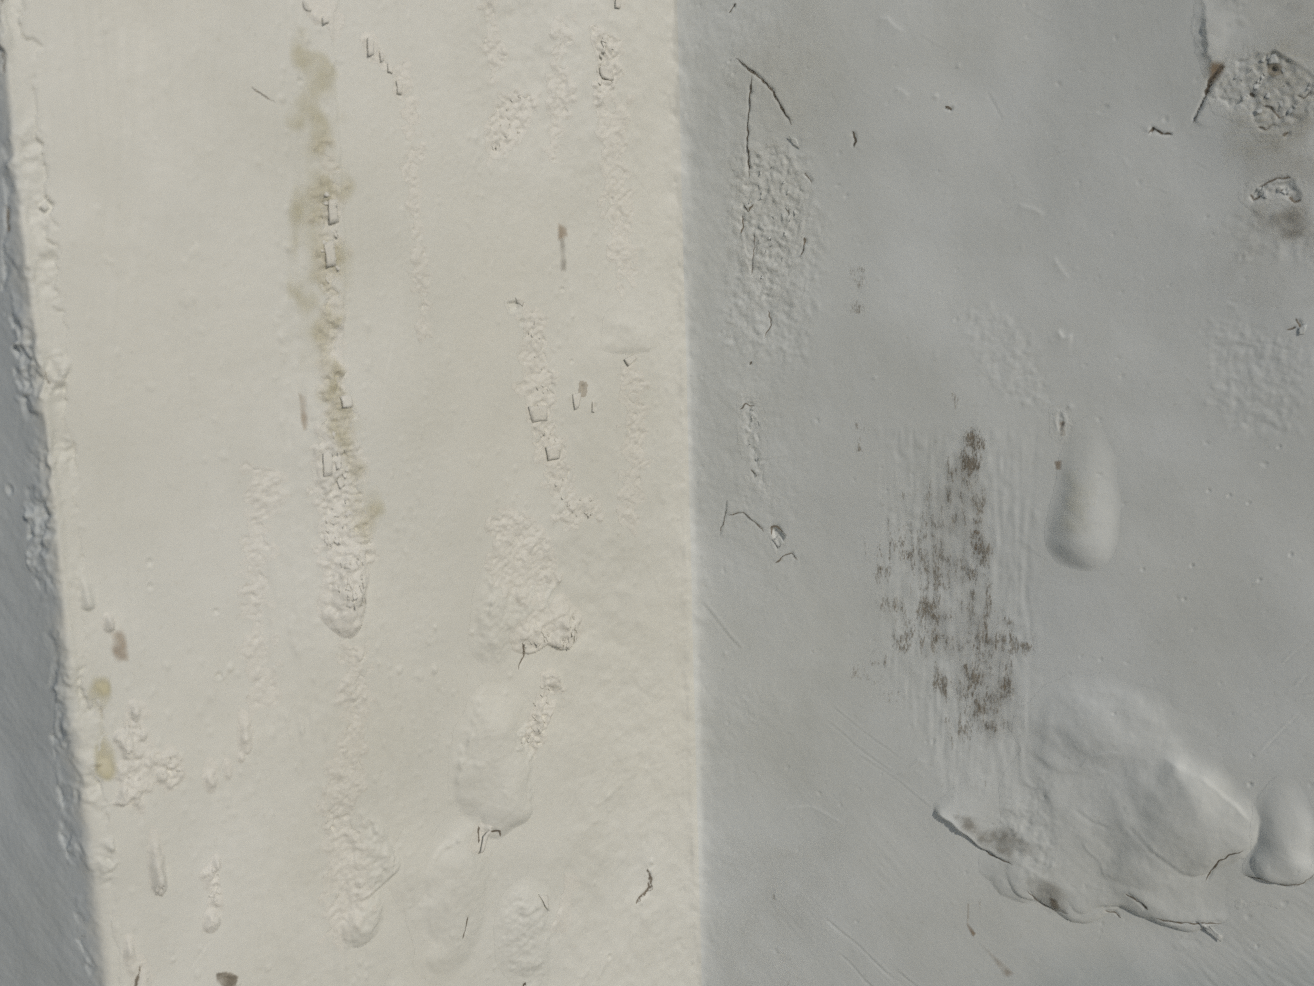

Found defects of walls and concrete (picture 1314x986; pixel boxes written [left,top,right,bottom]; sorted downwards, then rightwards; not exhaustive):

spalling [1206,42,1314,143]
mould [948,433,985,481]
mould [882,494,1032,735]